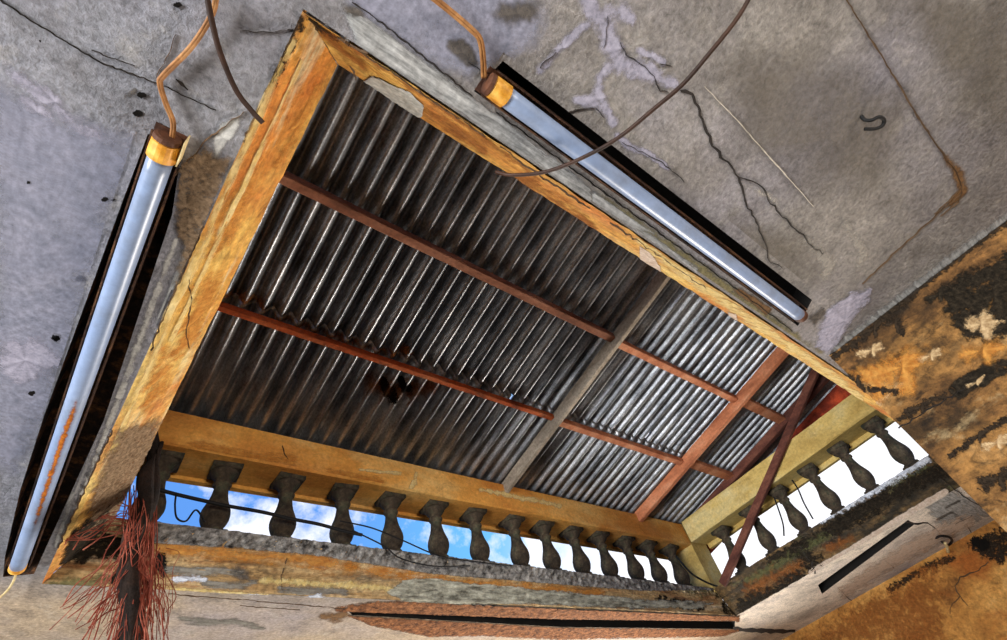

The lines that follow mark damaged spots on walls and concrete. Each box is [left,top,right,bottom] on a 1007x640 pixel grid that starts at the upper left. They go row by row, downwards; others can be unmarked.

crack [0,0,299,176]
peeling [350,66,424,118]
crack [150,226,205,351]
leakage [54,15,339,548]
rust [140,278,264,411]
rust [208,185,250,257]
crack [337,2,823,332]
leakage [344,0,1007,402]
peeling [810,289,872,352]
rust [944,156,968,207]
spalling [149,522,740,640]
leakage [656,457,950,616]